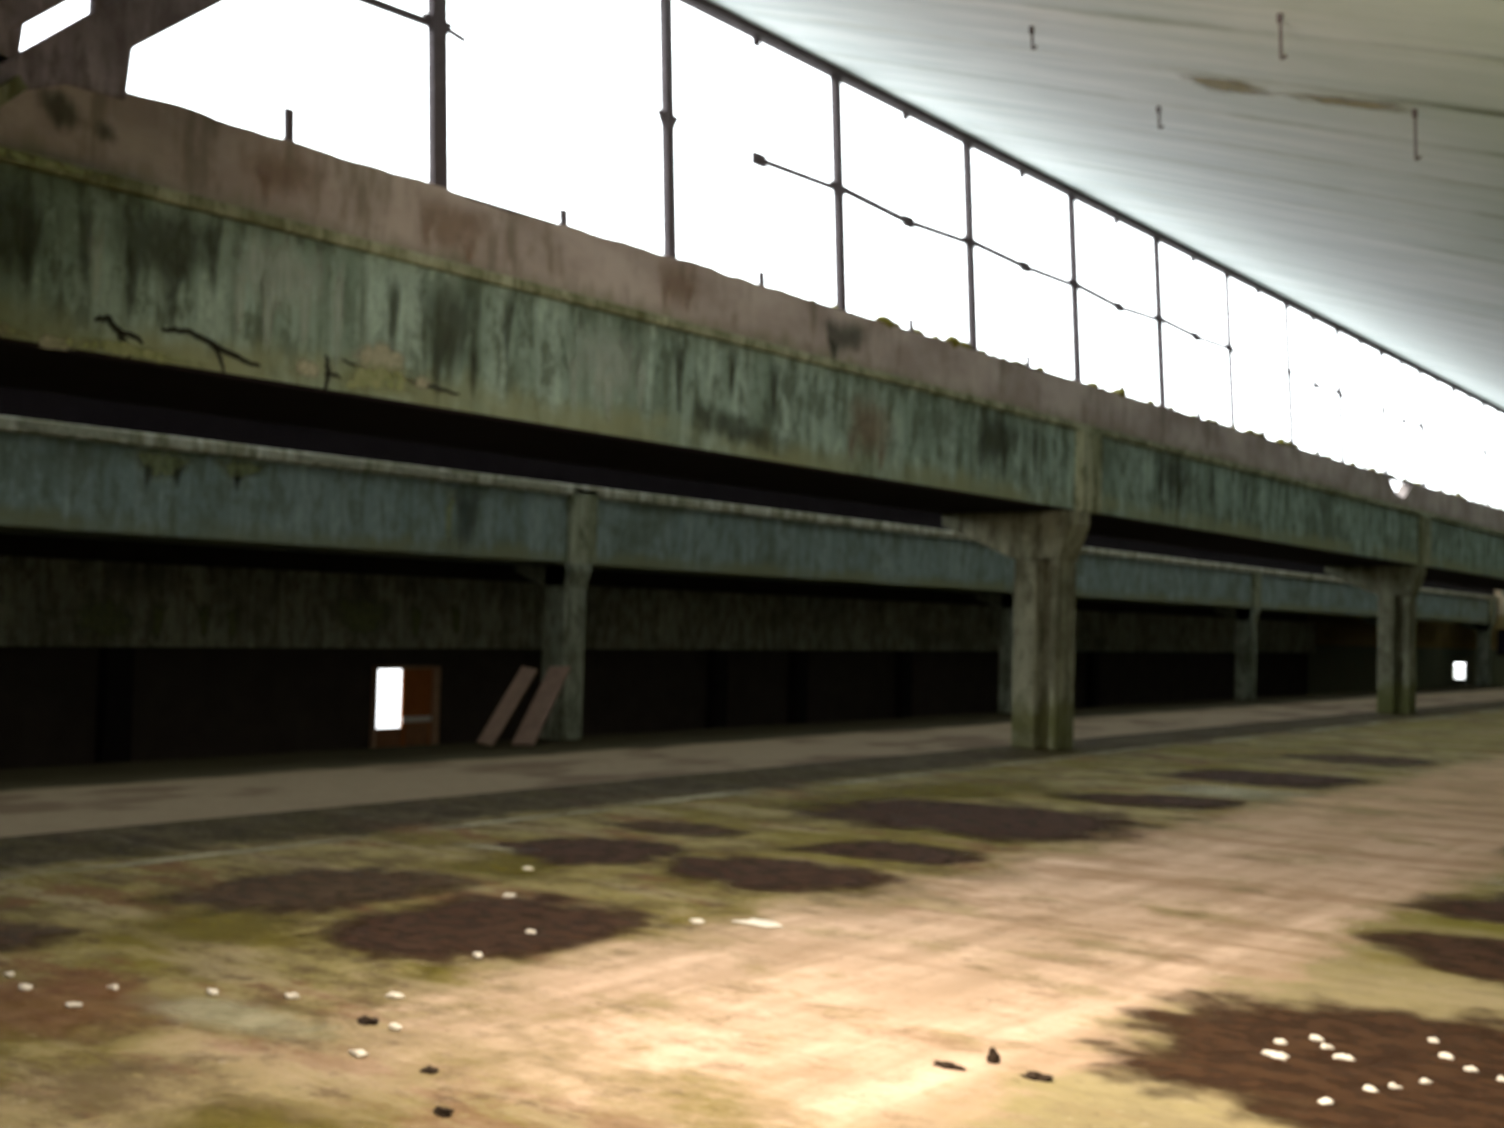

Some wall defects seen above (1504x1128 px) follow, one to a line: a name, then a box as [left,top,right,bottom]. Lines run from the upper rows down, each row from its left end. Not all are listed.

damp [128,216,219,310]
crack [94,314,261,373]
damp [390,291,398,336]
damp [434,291,477,389]
damp [505,305,513,349]
damp [828,322,860,356]
damp [708,411,777,445]